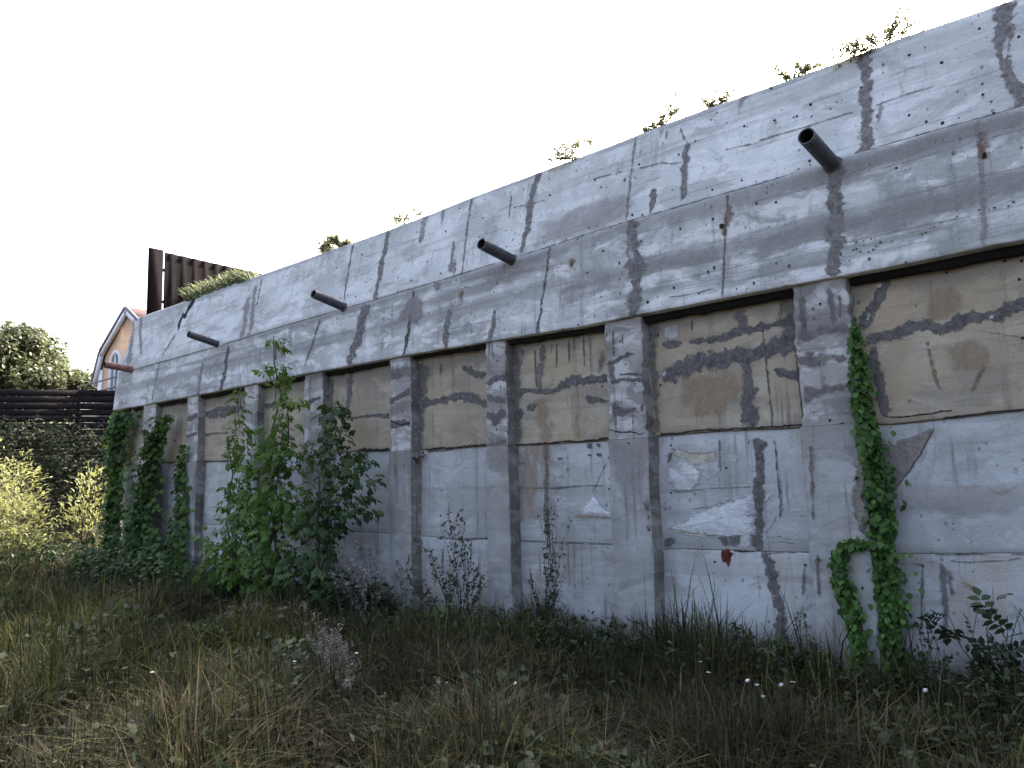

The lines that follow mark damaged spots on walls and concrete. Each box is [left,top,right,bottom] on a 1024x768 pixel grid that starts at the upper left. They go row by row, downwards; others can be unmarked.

peeling [664,493,772,548]
corrosion [721,549,733,567]